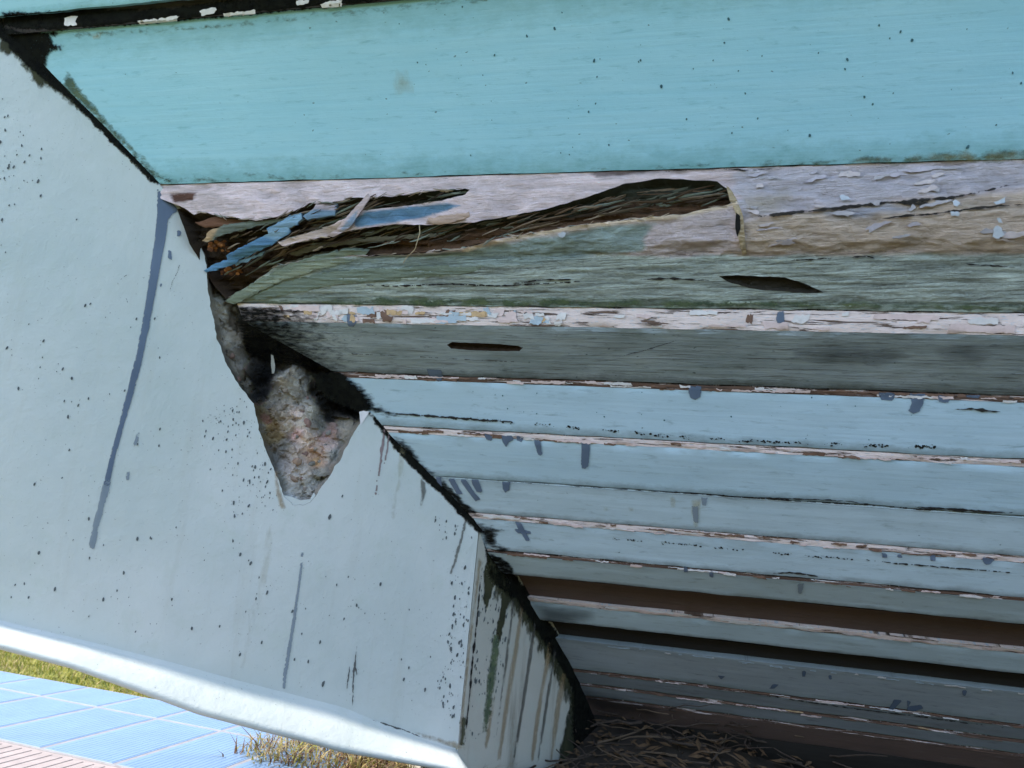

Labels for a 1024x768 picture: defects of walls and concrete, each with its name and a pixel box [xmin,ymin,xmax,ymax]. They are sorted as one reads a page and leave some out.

peeling [804,166,966,239]
peeling [980,218,1024,242]
crack [366,279,580,287]
crack [643,275,709,283]
peeling [279,304,567,326]
peeling [690,310,830,331]
peeling [873,313,1016,334]
spalling [202,249,369,505]
peeling [398,430,637,446]
peeling [655,441,968,464]
leakage [236,307,597,759]
peeling [823,543,1003,559]